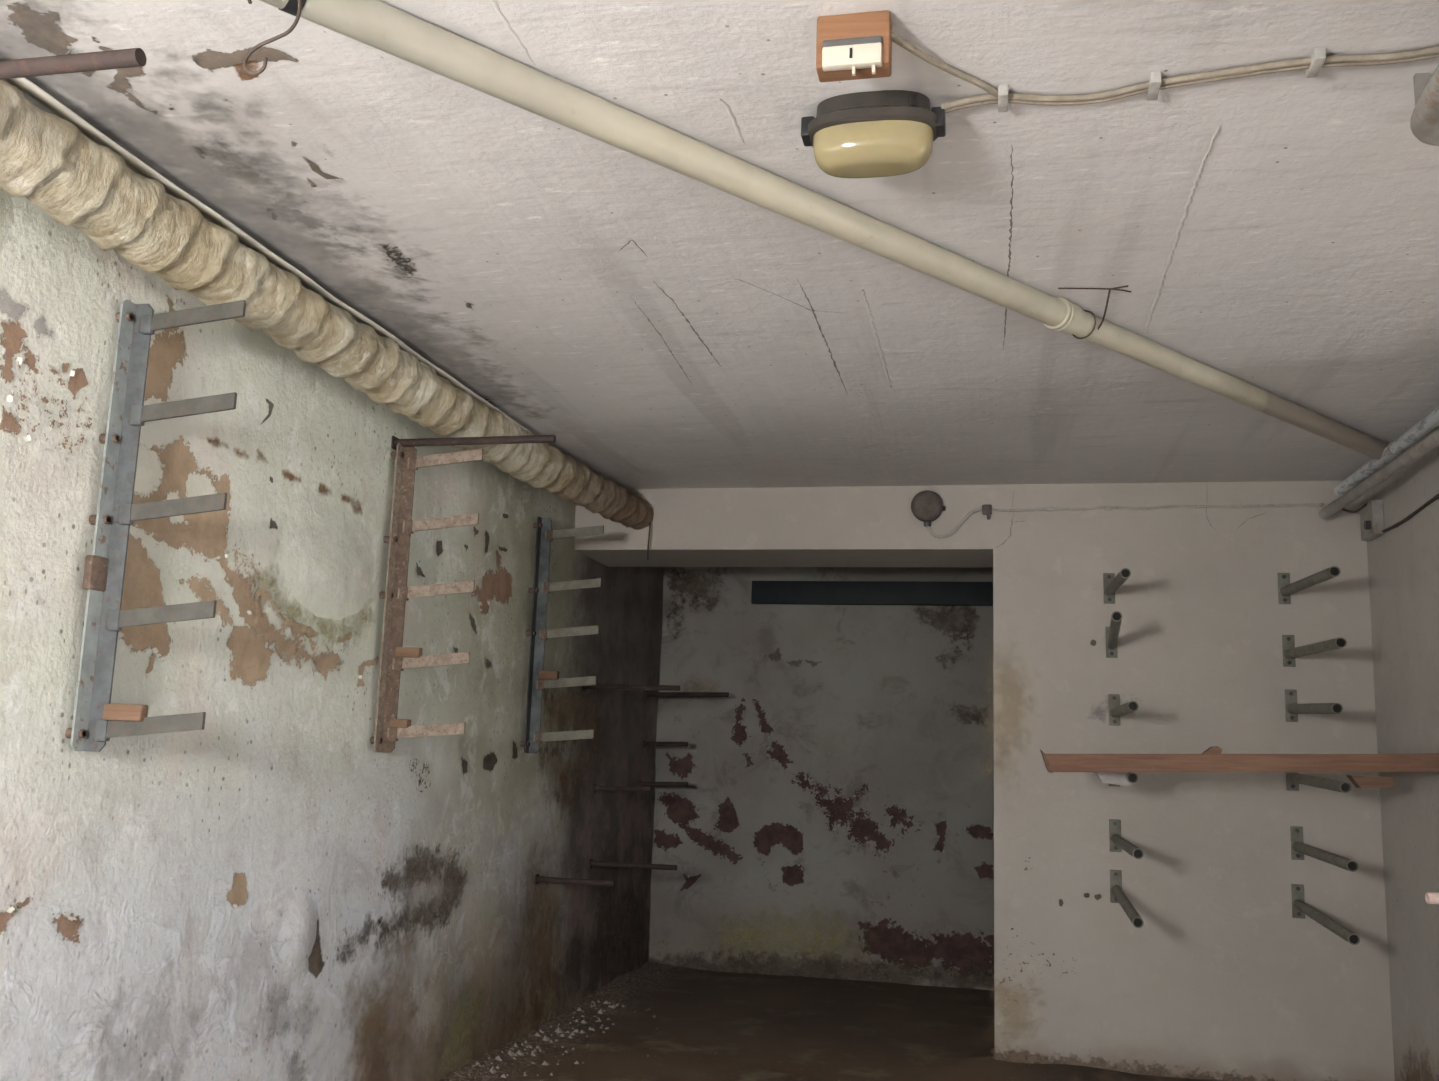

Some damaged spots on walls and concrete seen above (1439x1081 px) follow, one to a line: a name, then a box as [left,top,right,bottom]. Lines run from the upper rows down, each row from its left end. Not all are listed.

peeling [7,2,113,55]
peeling [107,67,174,115]
peeling [191,47,298,80]
peeling [291,141,343,187]
peeling [0,318,92,455]
peeling [118,435,378,689]
peeling [464,527,513,634]
peeling [654,752,805,886]
peeling [730,698,993,860]
peeling [0,897,34,934]
peeling [52,912,85,943]
damp [337,849,467,962]